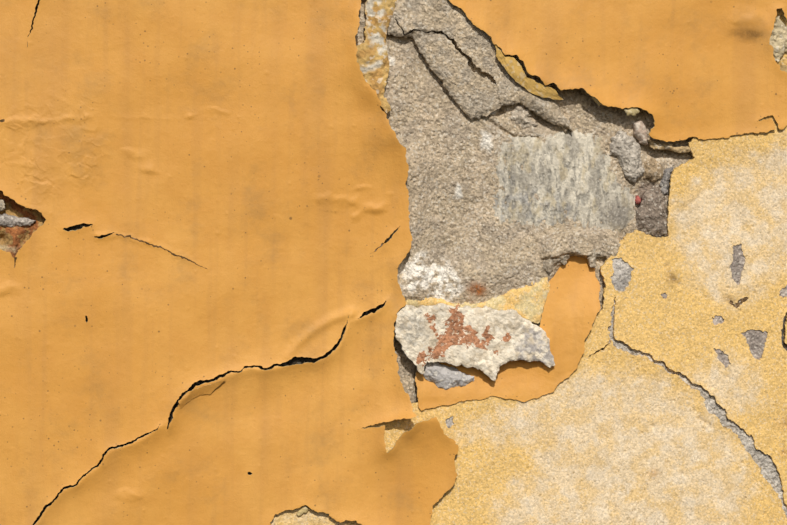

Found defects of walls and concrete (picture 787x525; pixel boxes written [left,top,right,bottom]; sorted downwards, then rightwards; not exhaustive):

crack [27,0,40,37]
spalling [0,190,46,258]
crack [63,223,207,269]
peeling [355,0,787,525]
crack [33,301,386,525]
crack [589,300,787,517]
peeling [270,505,361,525]